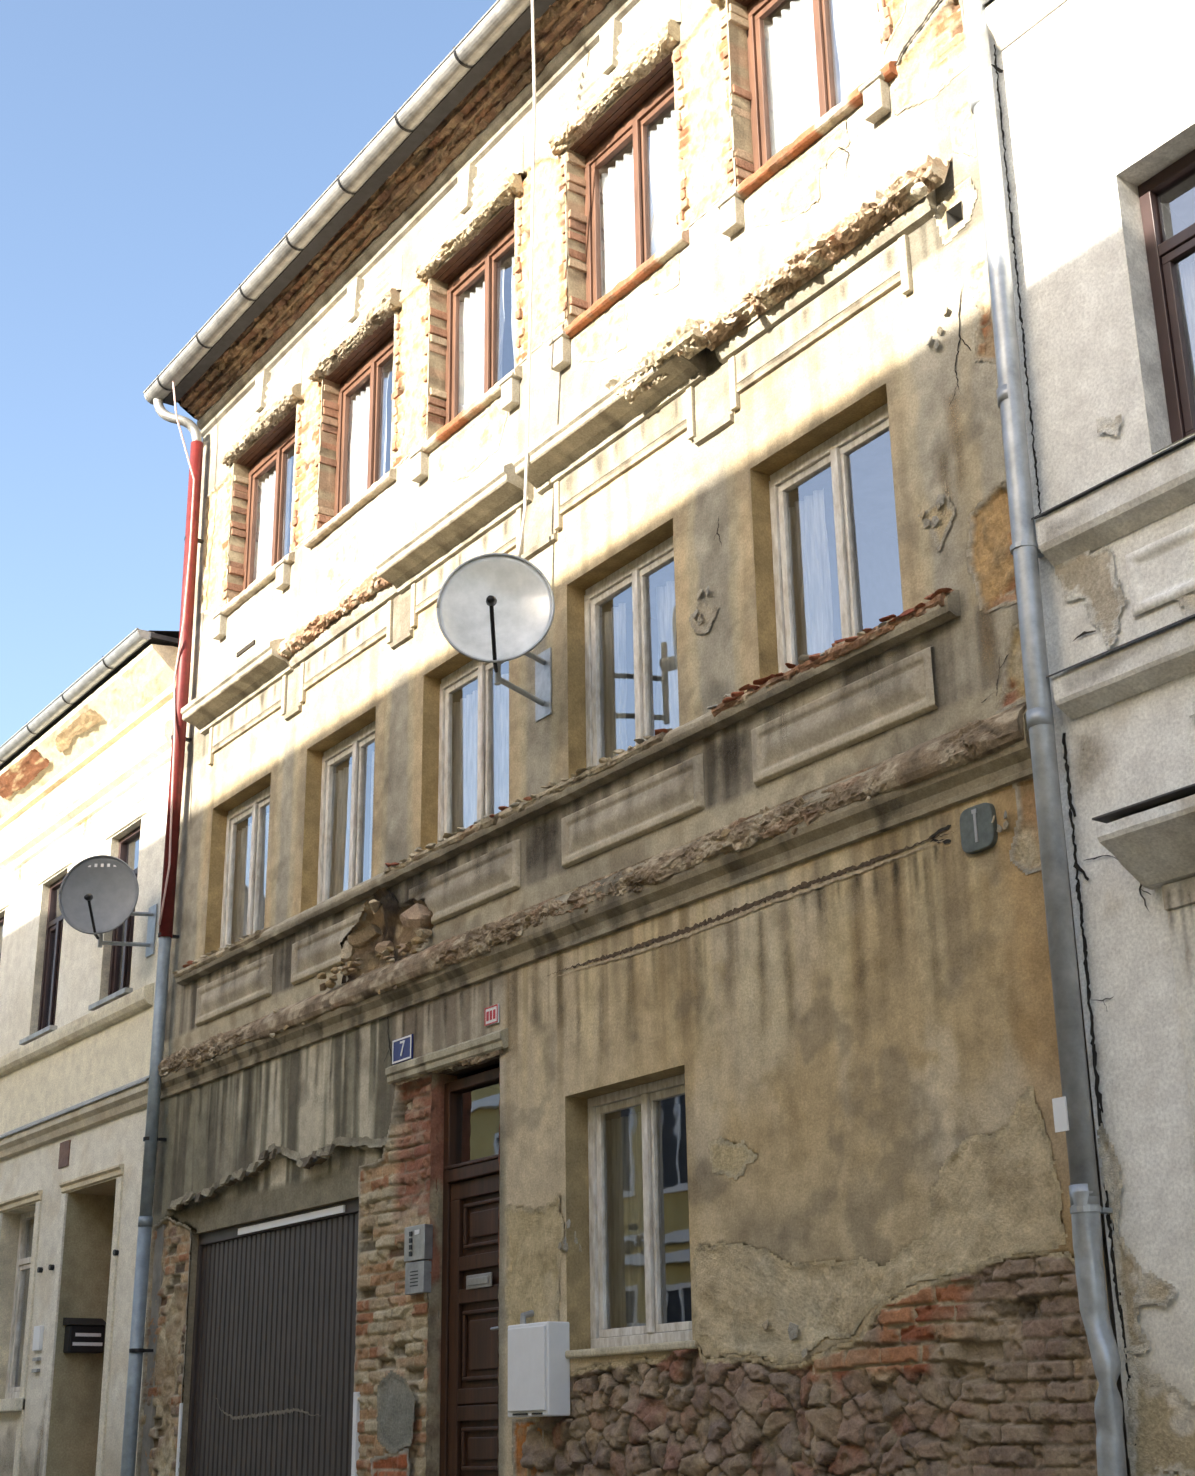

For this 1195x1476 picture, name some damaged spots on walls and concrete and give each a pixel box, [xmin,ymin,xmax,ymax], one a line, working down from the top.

flaking render [877,0,969,116]
flaking render [177,0,851,659]
spalling [605,155,977,404]
crack [949,282,971,406]
spalling [158,483,1027,1077]
peeling [1055,545,1127,650]
flaking render [136,1049,503,1476]
flaking render [505,1085,1099,1476]